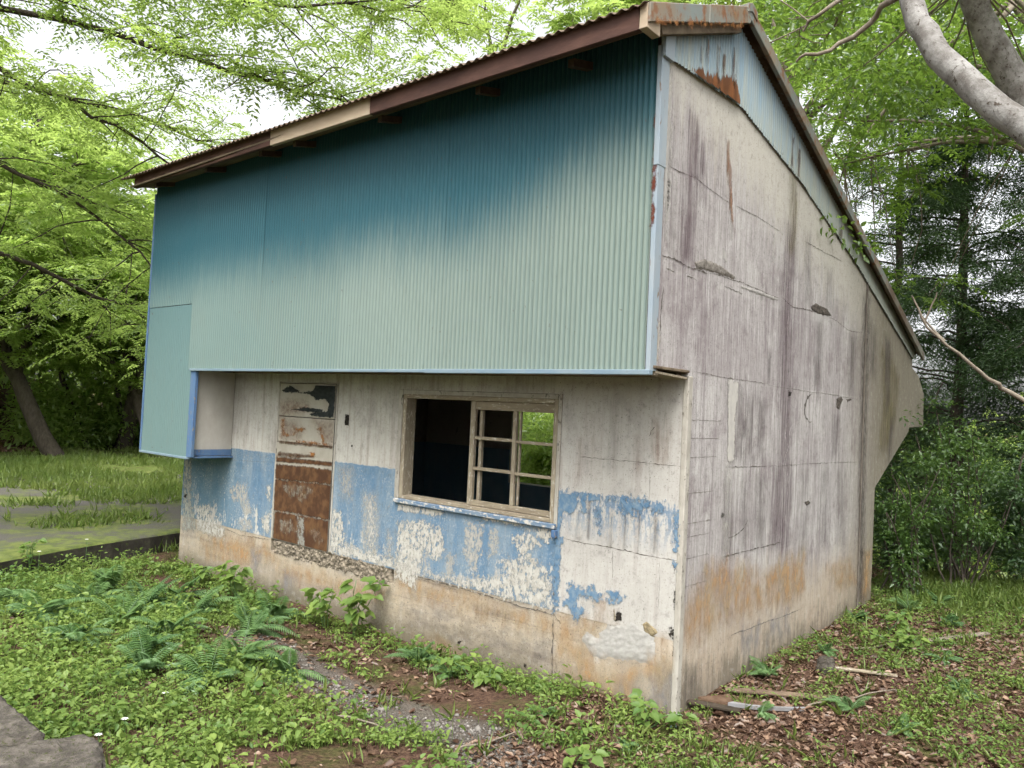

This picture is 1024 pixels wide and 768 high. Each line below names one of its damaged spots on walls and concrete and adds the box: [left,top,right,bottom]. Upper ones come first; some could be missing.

corrosion [692,39,740,104]
corrosion [649,158,657,227]
peeling [282,385,349,425]
peeling [181,459,225,541]
corrosion [273,419,332,552]
peeling [230,482,681,666]
leakage [688,552,804,631]